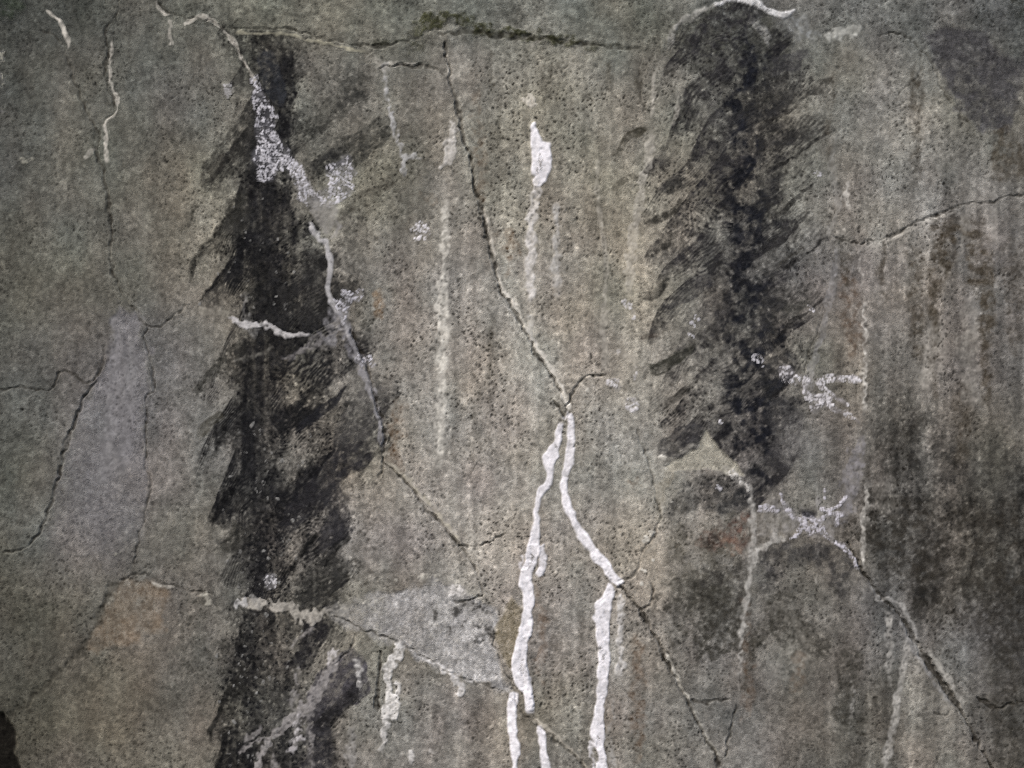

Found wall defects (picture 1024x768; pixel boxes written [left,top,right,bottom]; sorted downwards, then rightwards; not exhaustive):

crack [0,0,214,721]
damp [155,22,469,768]
crack [154,0,681,416]
crack [350,324,507,605]
crack [332,617,590,768]
damp [466,309,497,487]
crack [616,426,738,768]
damp [506,0,1024,768]
crack [804,133,1024,406]
crack [846,541,1024,768]